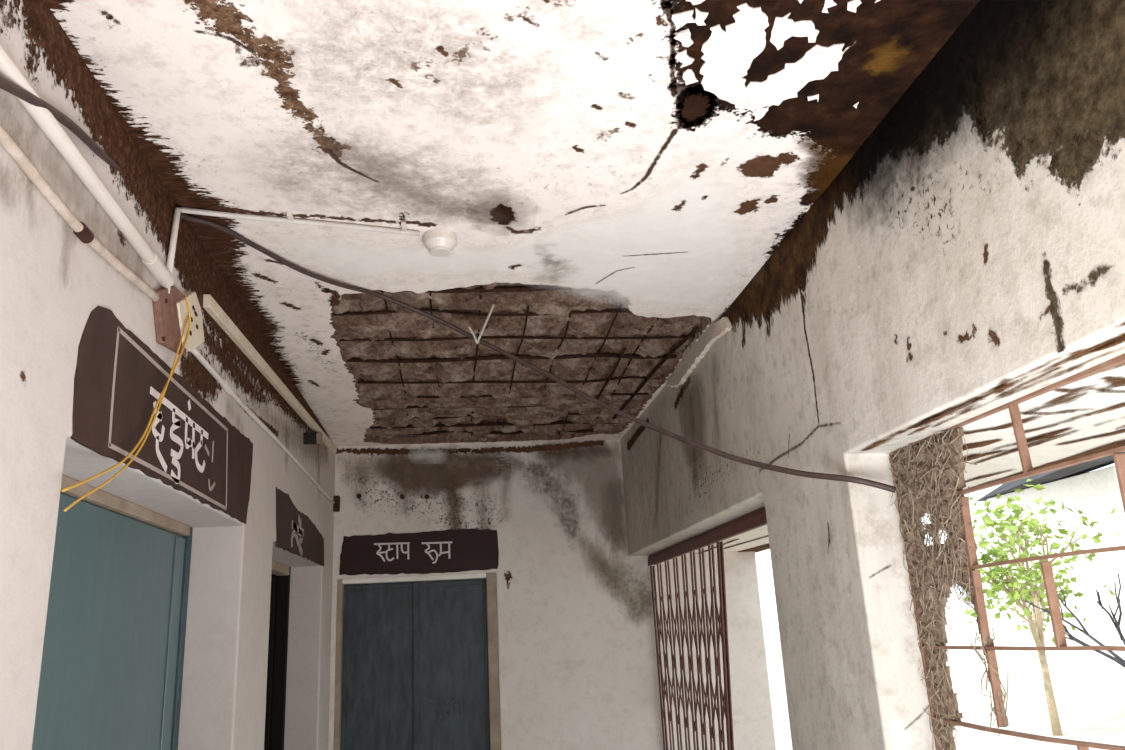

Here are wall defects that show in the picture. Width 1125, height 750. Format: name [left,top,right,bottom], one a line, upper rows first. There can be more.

spalling [0,0,733,457]
crack [565,129,678,215]
crack [661,0,677,97]
peeling [650,0,980,263]
crack [760,294,837,472]
water stain [359,452,515,530]